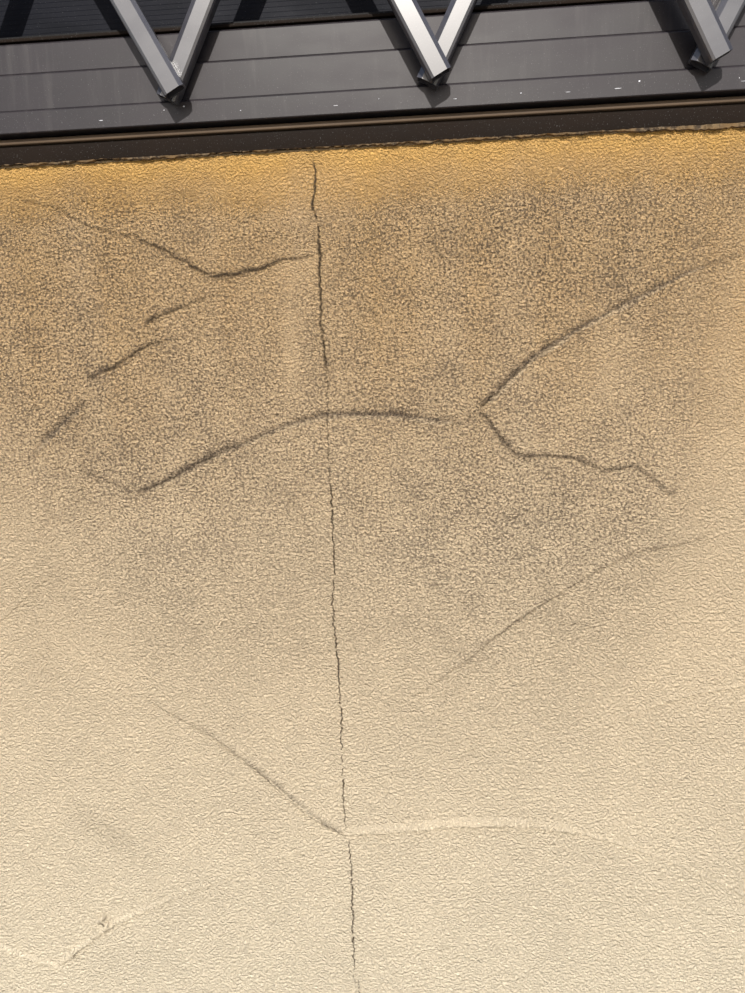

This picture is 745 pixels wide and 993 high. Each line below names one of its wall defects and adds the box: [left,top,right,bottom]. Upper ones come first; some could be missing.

damp [0,127,745,210]
damp [0,264,121,414]
crack [90,163,328,396]
damp [448,202,672,302]
crack [330,485,360,993]